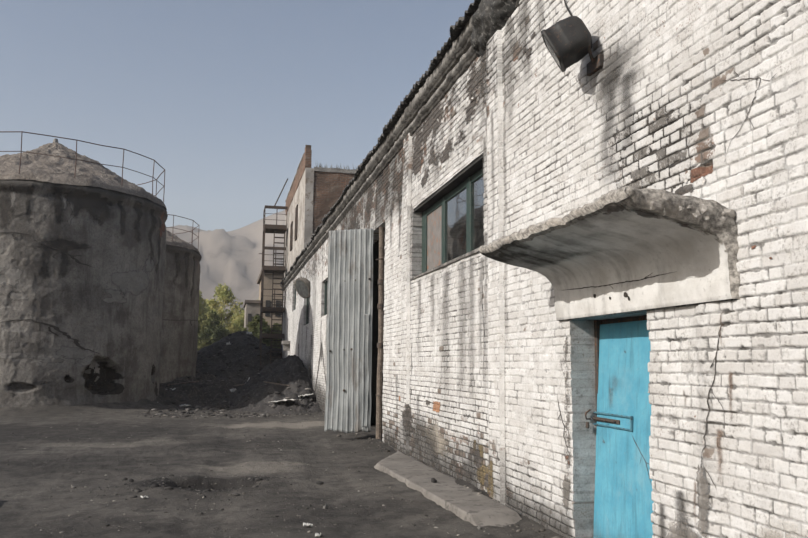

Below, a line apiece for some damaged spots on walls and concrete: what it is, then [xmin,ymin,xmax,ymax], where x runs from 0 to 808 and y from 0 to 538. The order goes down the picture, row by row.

leakage [602,73,631,150]
peeling [609,96,714,195]
leakage [47,185,161,271]
spalling [603,206,659,219]
leakage [35,239,89,279]
crack [567,272,673,290]
crack [4,319,100,354]
spalling [9,381,47,390]
spalling [64,360,124,395]
peeling [399,396,413,436]
crack [701,312,724,488]